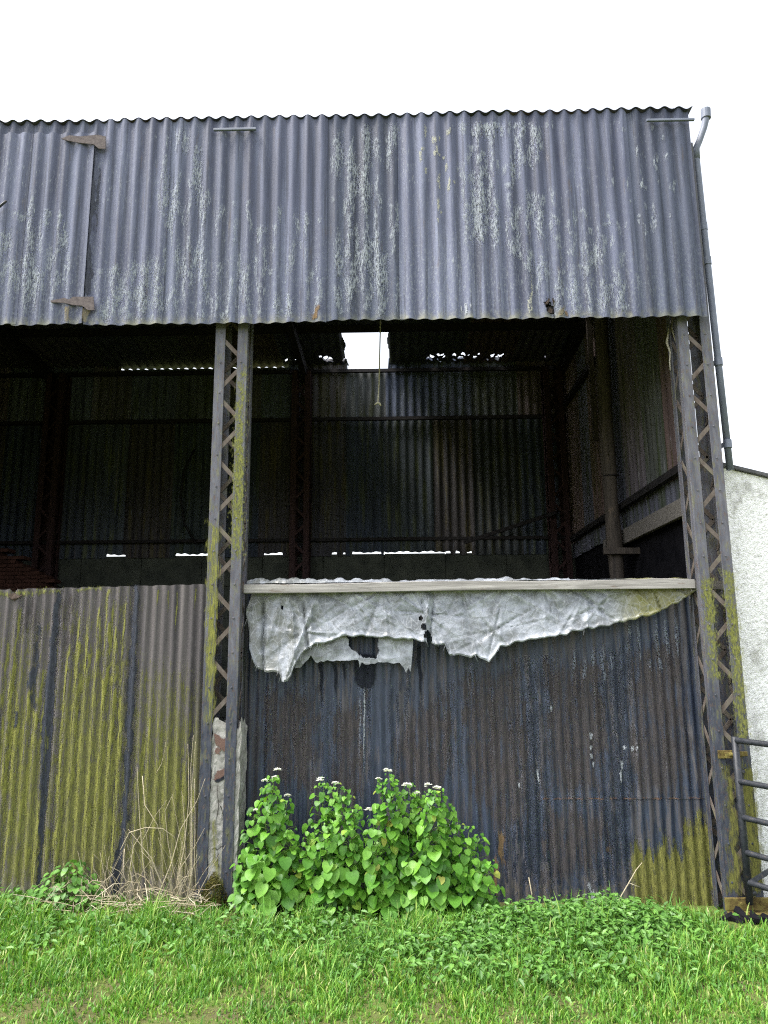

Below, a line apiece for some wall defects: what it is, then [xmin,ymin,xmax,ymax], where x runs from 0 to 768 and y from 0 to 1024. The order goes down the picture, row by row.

leakage [84,147,101,295]
leakage [0,585,194,900]
leakage [635,810,713,905]